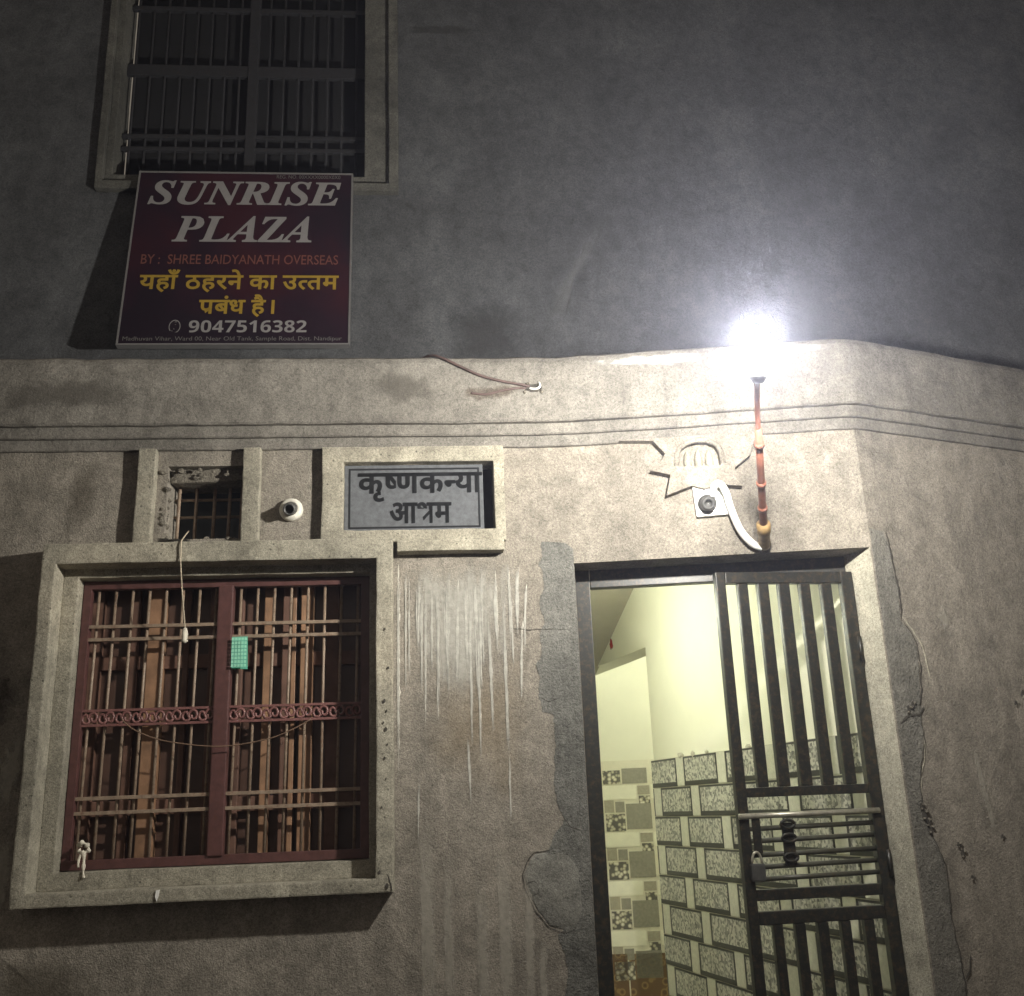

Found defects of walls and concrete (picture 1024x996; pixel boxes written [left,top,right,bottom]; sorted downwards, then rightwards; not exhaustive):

water stain [397,564,527,797]
peeling [536,541,598,996]
crack [885,529,971,996]